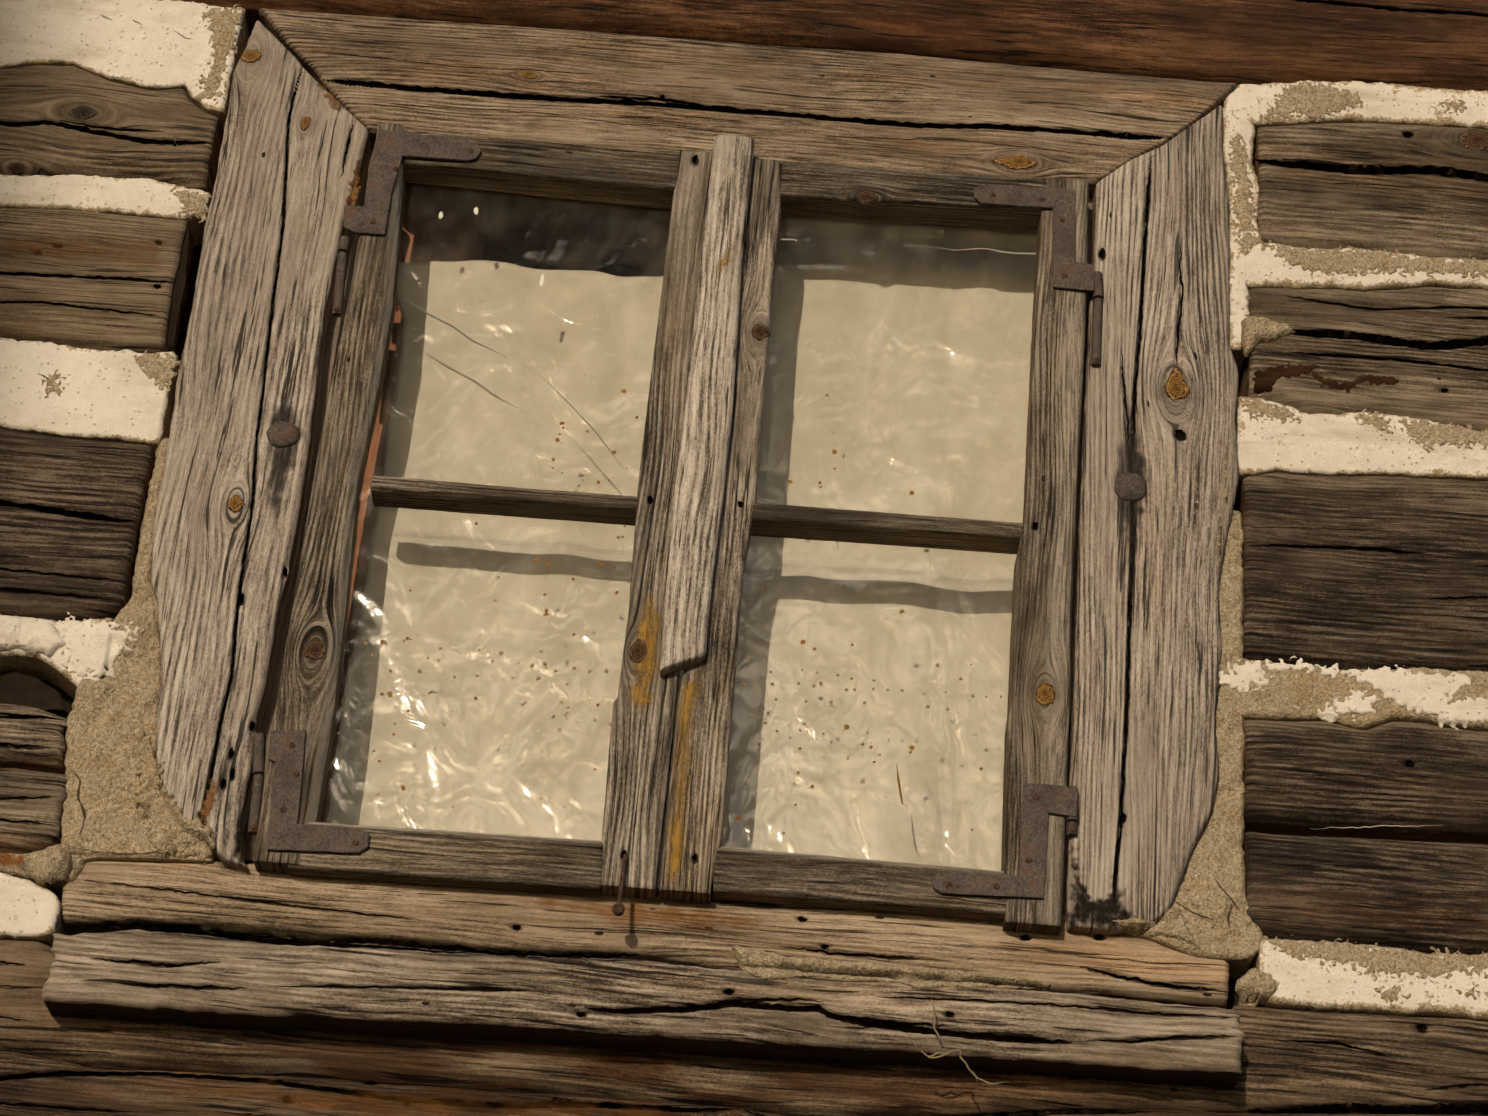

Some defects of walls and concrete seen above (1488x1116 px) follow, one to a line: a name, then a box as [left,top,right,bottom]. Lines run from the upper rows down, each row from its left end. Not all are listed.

crack [1296,0,1488,17]
crack [0,75,246,387]
crack [0,479,134,522]
crack [203,51,1205,895]
crack [0,567,128,601]
peeling [58,612,144,679]
spalling [0,671,62,710]
peeling [1218,656,1488,730]
crack [0,712,640,991]
crack [585,924,1238,1044]